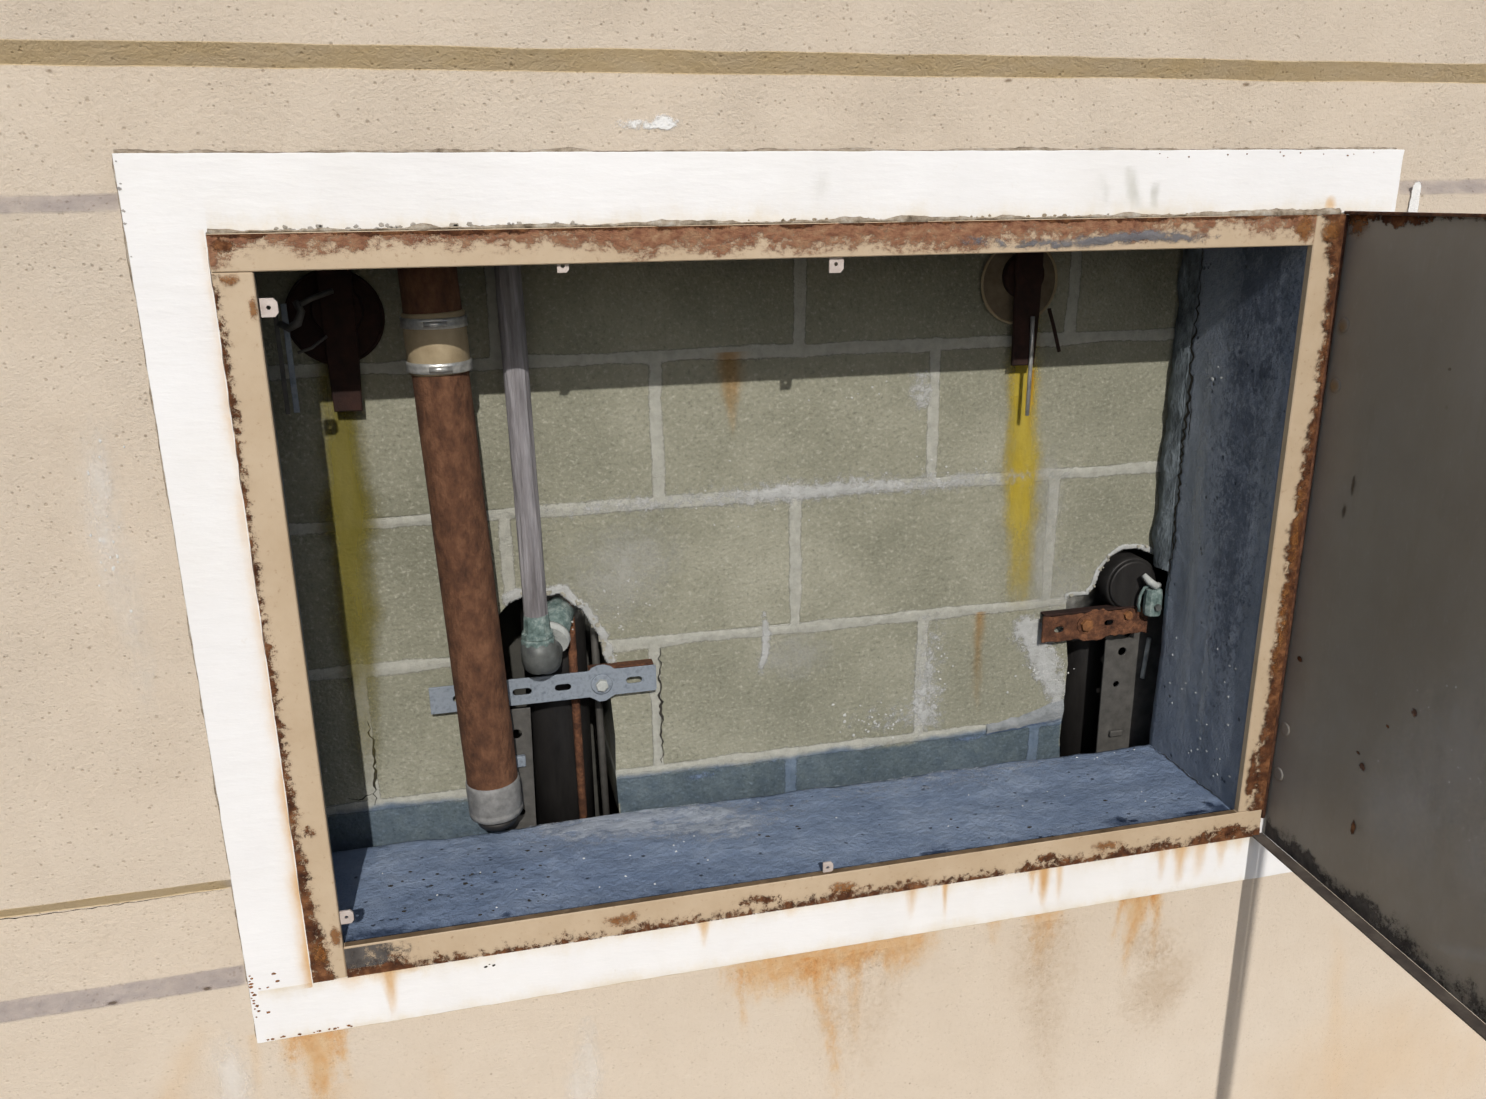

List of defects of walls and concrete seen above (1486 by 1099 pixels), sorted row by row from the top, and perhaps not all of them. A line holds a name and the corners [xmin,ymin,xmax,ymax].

damp [572,365,1051,549]
spalling [502,589,522,606]
spalling [546,584,615,663]
rust [206,214,1486,983]
spalling [1065,544,1154,599]